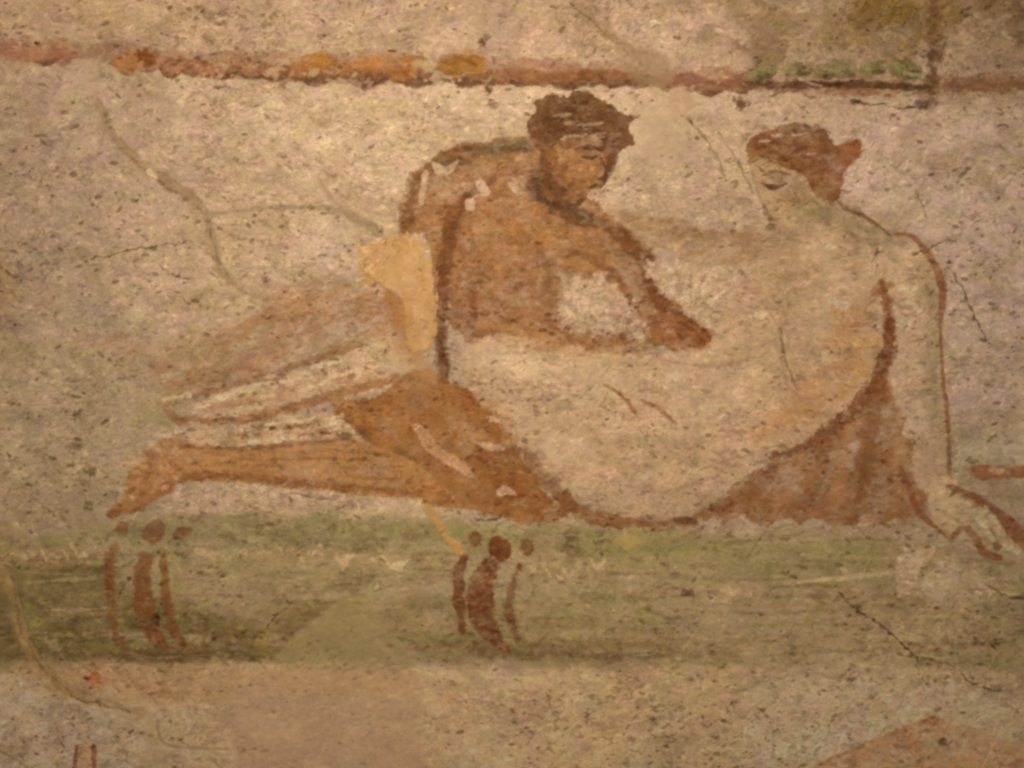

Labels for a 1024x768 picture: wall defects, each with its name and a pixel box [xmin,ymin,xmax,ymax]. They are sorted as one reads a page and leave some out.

crack [81,58,378,306]
crack [836,588,1005,694]